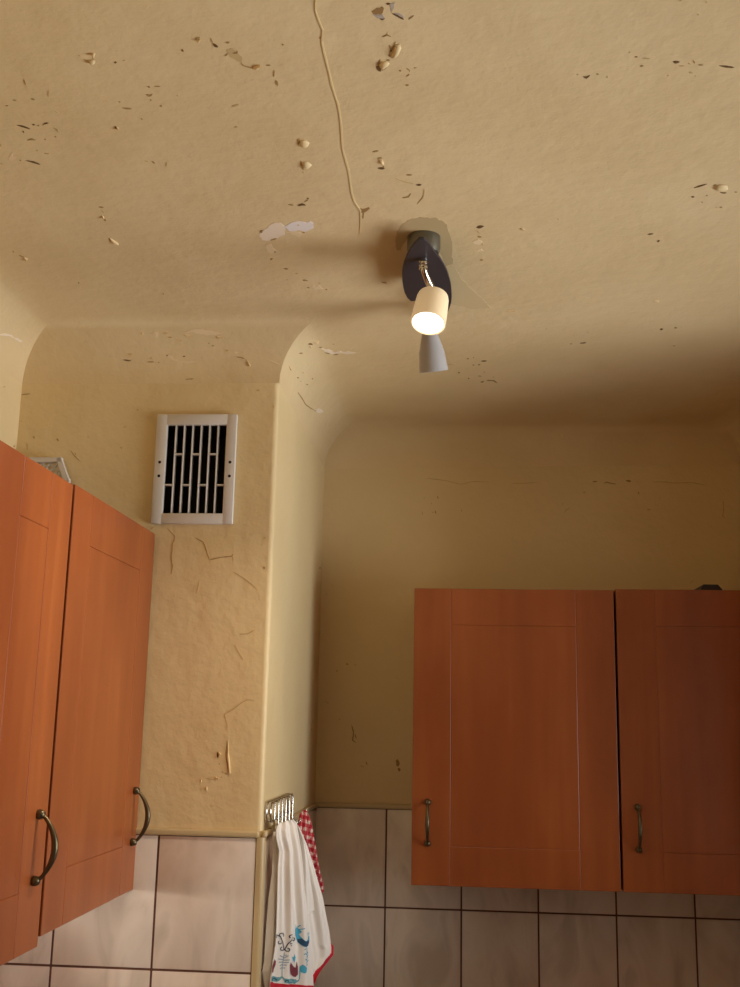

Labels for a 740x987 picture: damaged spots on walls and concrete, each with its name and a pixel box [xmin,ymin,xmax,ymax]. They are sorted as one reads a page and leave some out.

crack [377,13,414,77]
peeling [259,221,314,260]
crack [206,699,251,780]